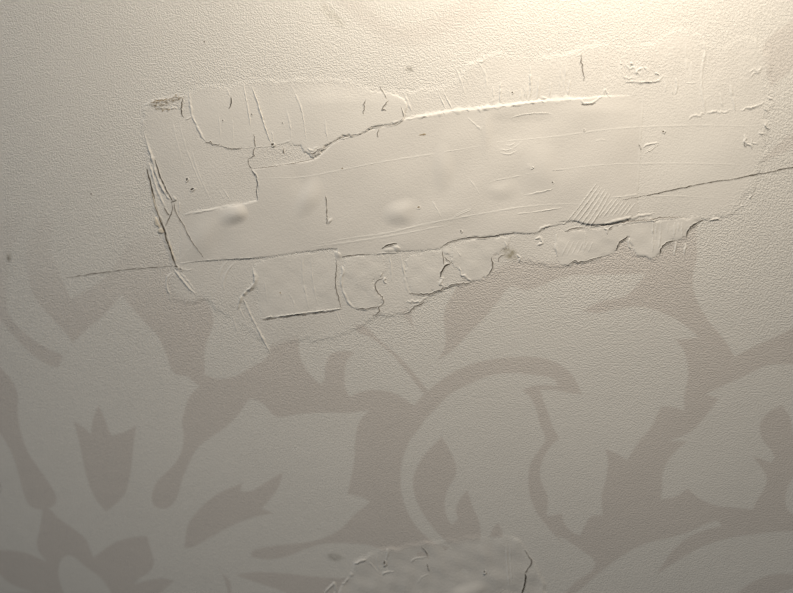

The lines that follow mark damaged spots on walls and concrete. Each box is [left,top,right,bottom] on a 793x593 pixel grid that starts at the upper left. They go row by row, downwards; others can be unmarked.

spalling [143,93,285,154]
peeling [307,88,610,159]
crack [67,132,256,278]
crack [243,134,313,205]
peeling [377,242,401,255]
spalling [404,230,514,315]
peeling [535,193,754,267]
crack [623,166,793,200]